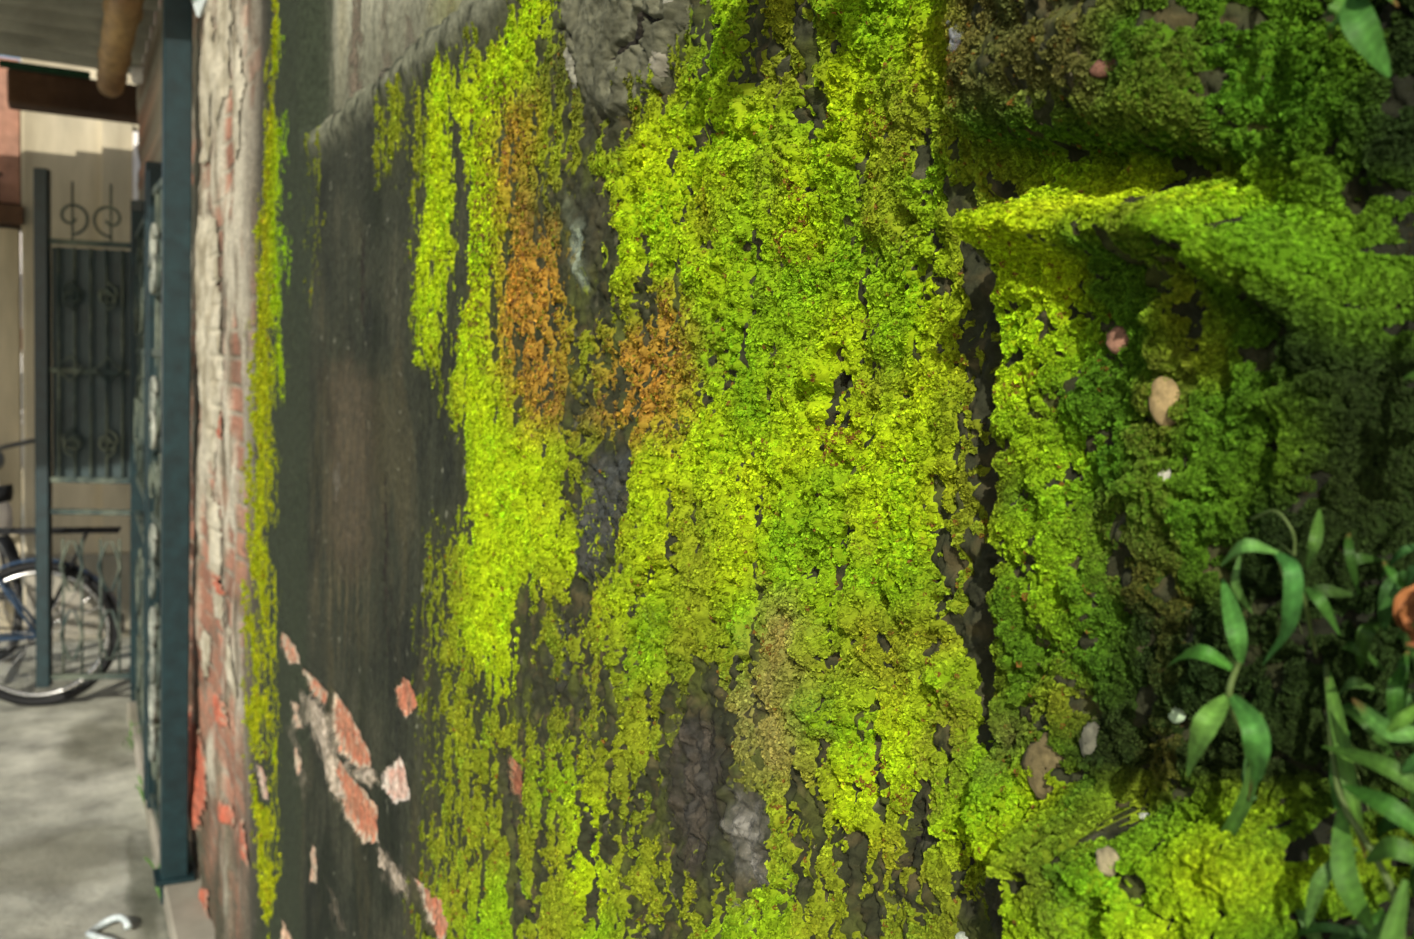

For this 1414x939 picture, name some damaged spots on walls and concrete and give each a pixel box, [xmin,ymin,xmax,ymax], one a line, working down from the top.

peeling [199,0,246,165]
peeling [189,215,248,867]
spalling [256,764,268,800]
spalling [281,633,448,939]
spalling [198,887,211,920]